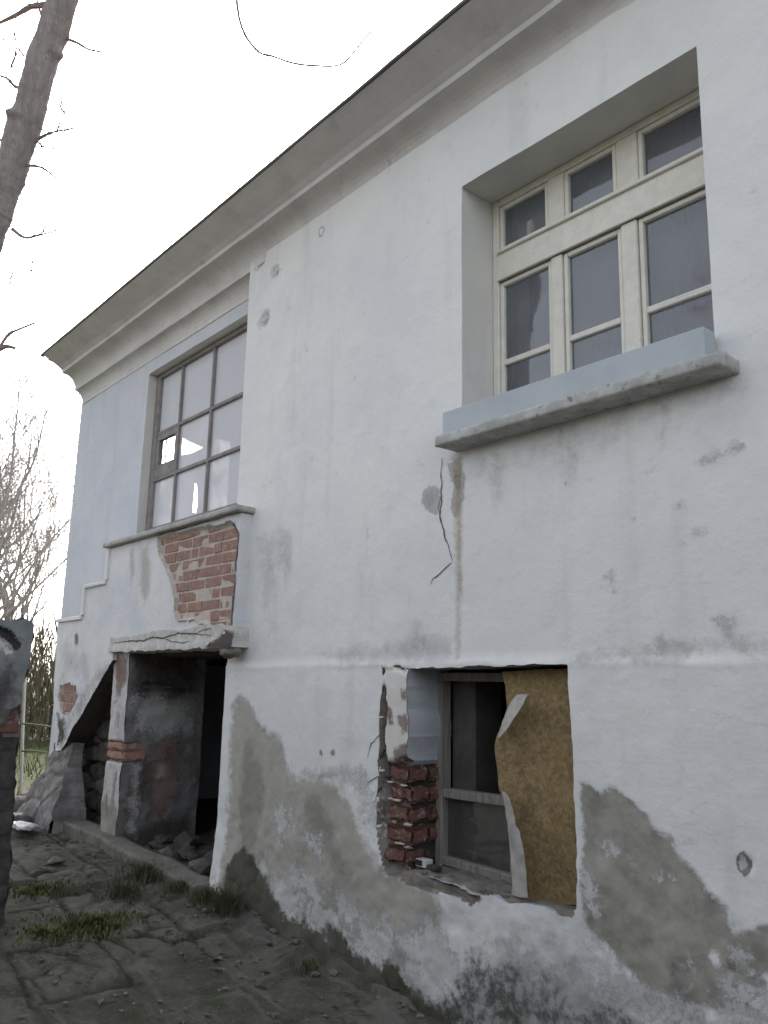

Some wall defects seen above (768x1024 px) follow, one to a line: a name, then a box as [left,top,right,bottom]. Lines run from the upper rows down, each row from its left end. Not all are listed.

crack [113,629,211,644]
flaking render [157,518,239,648]
crack [431,465,453,583]
flaking render [58,682,78,714]
peeling [107,655,194,834]
flaking render [379,667,412,772]
water stain [219,696,441,940]
water stain [444,784,768,1024]
spalling [736,851,752,877]